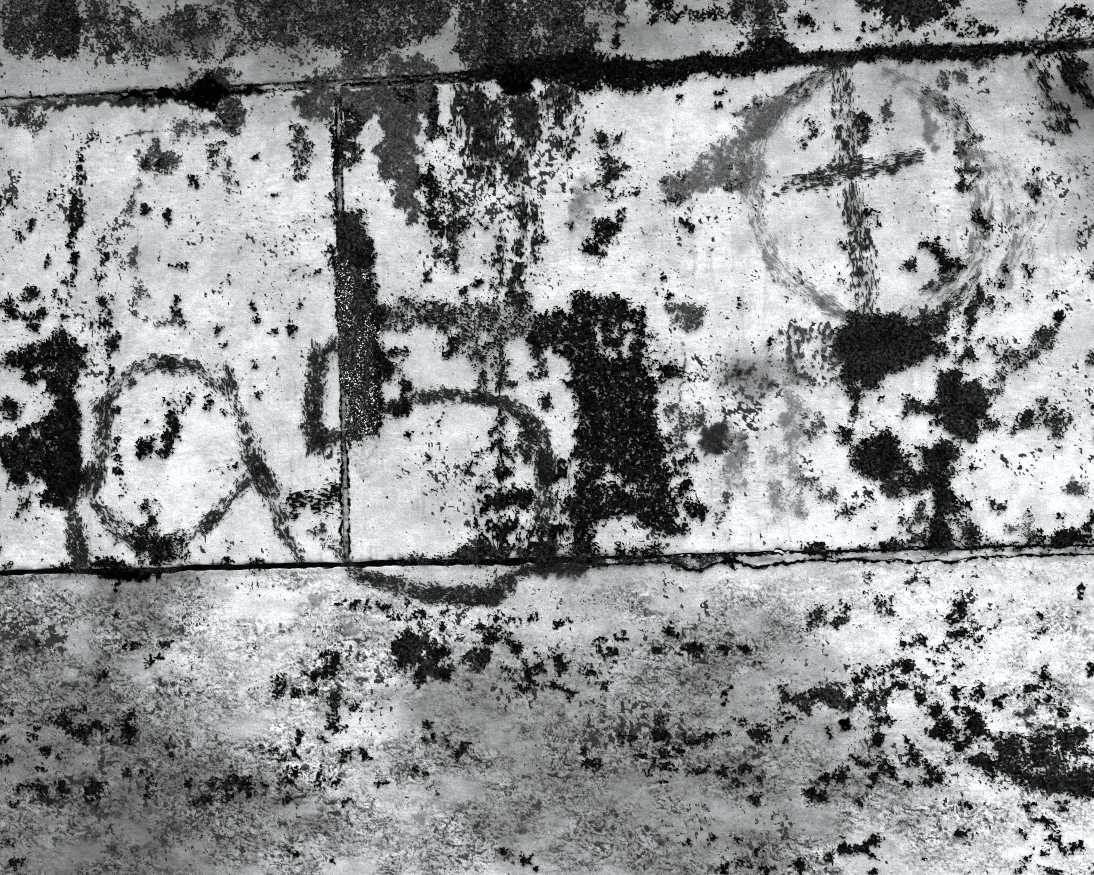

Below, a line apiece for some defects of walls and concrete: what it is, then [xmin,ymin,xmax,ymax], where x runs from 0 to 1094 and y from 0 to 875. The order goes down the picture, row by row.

damp [775,52,867,70]
damp [333,76,597,309]